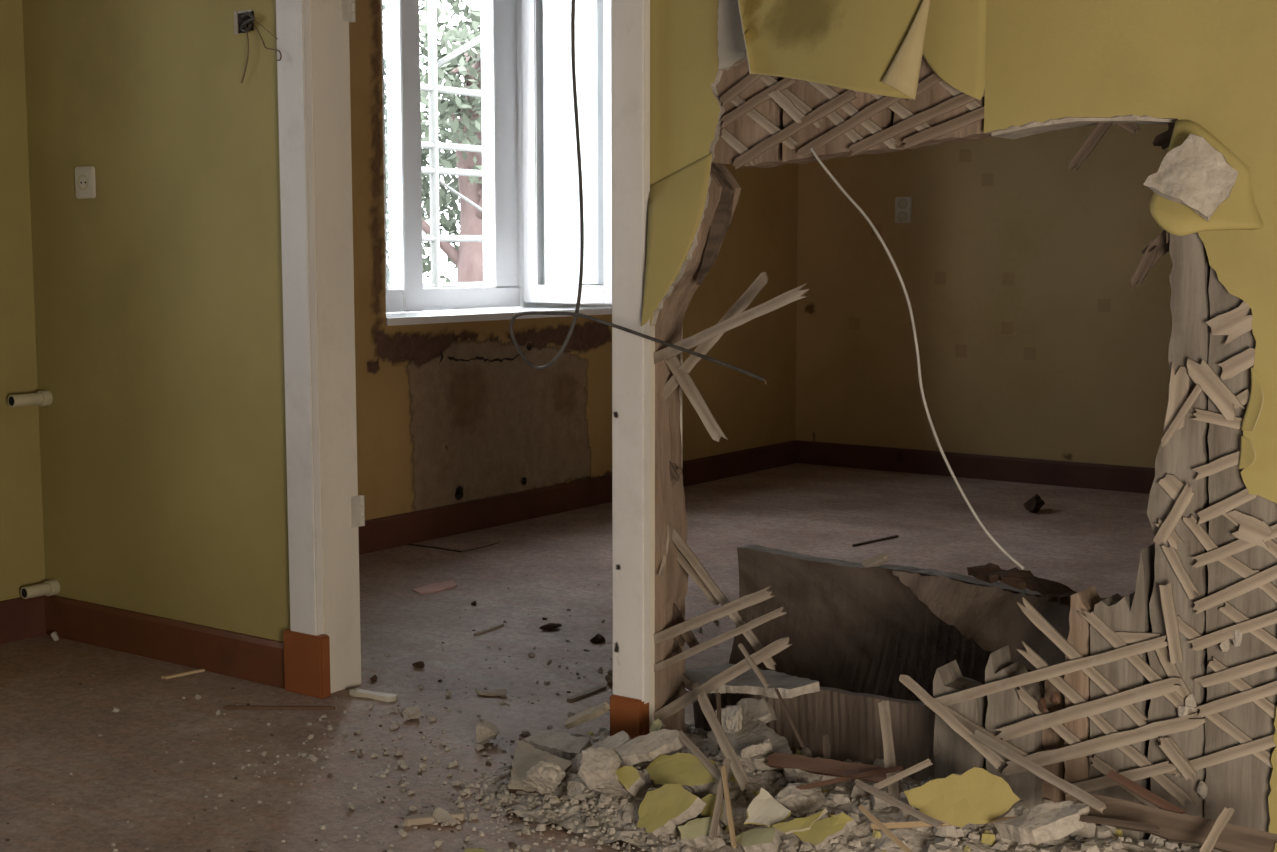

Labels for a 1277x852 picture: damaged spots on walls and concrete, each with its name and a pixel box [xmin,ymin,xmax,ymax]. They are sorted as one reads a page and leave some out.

peeling [407,339,591,511]
flaking render [653,0,994,733]
flaking render [1147,232,1277,832]